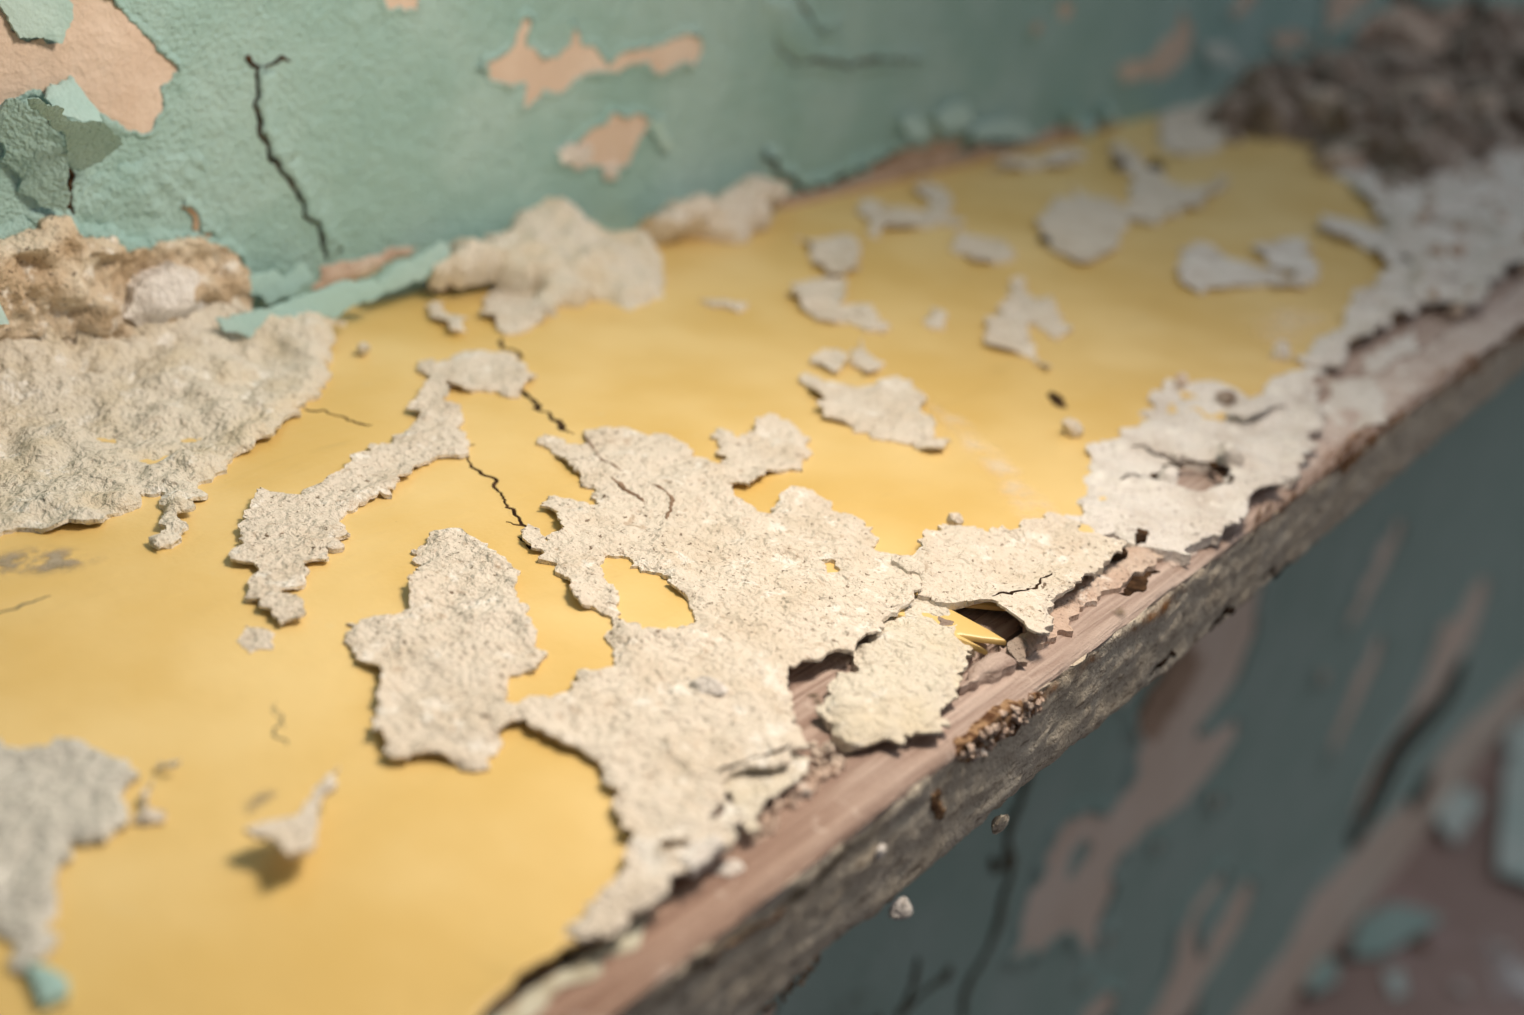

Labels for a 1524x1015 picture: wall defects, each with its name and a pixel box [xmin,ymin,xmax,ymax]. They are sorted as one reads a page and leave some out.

peeling [0,0,450,344]
crack [245,54,343,260]
peeling [476,7,705,116]
peeling [552,104,675,185]
peeling [1036,99,1231,262]
peeling [228,289,550,654]
crack [462,444,533,551]
peeling [343,147,1524,974]
peeling [0,737,181,1012]
peeling [244,766,339,858]
crack [878,780,1032,1015]
peeling [1231,563,1524,1015]